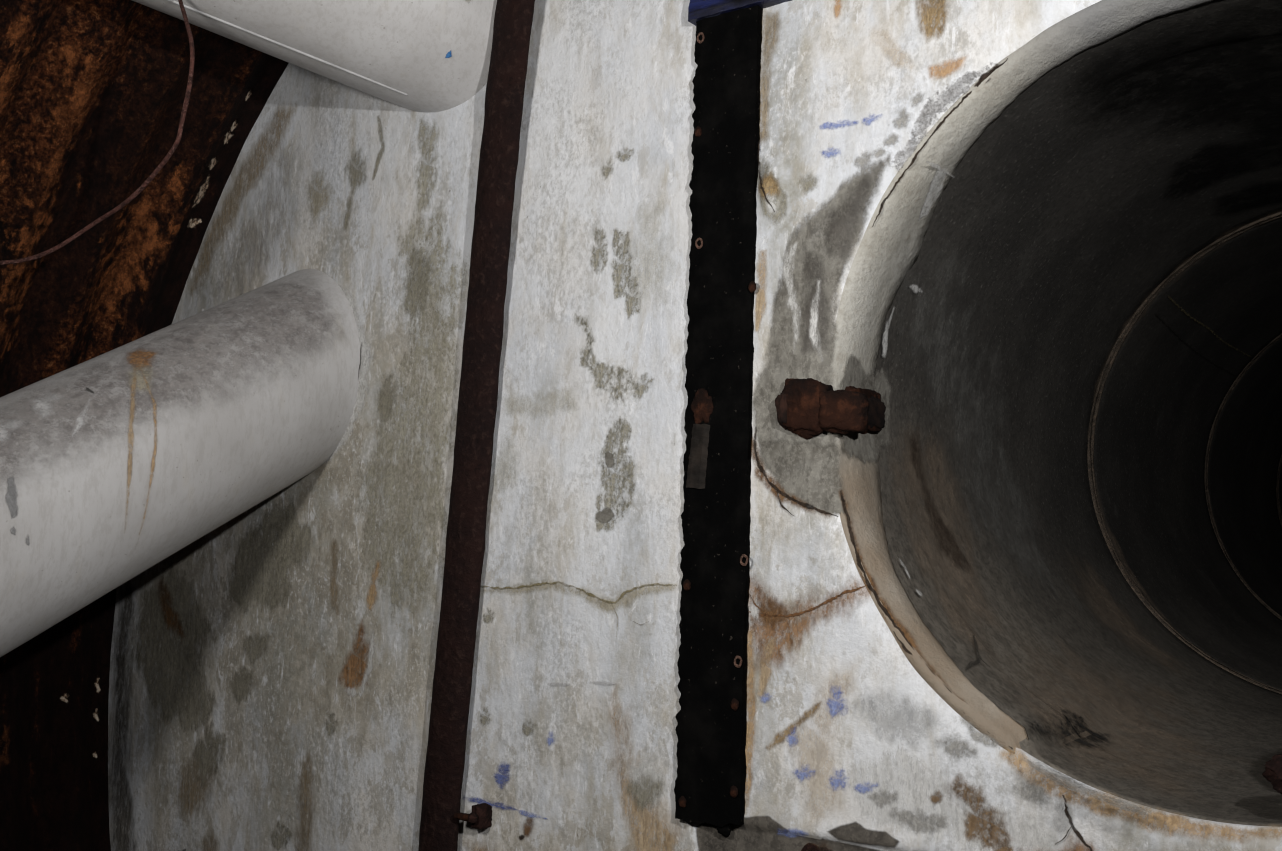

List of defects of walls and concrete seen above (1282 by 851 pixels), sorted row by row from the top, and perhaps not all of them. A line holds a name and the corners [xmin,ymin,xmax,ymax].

damp [759,16,778,140]
rust [0,8,113,359]
rust [73,164,187,342]
damp [755,253,766,330]
rust [127,351,157,518]
crack [482,582,676,638]
crack [748,428,1013,749]
damp [110,587,135,851]
damp [271,758,312,851]